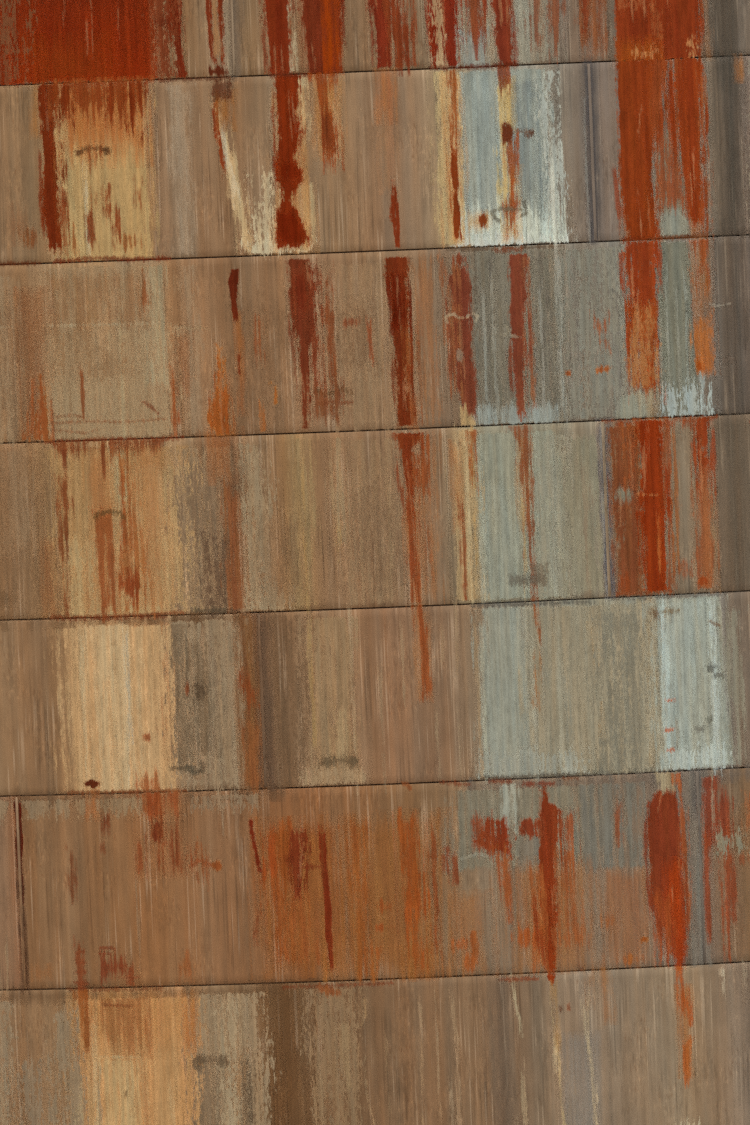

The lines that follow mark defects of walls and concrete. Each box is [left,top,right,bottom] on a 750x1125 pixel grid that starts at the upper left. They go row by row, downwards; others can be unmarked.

rust [0,0,187,252]
rust [96,379,180,622]
rust [207,269,241,435]
rust [264,0,373,429]
rust [384,186,432,699]
rust [370,0,519,492]
rust [579,0,709,393]
rust [607,417,714,593]
rust [249,817,344,971]
rust [473,786,586,985]
rust [641,772,693,1085]
rust [702,776,750,960]